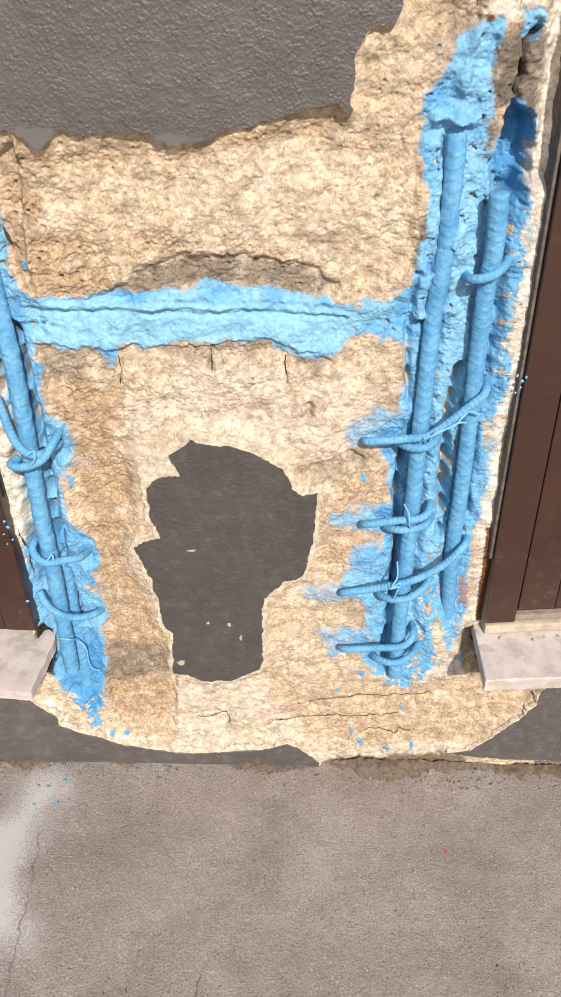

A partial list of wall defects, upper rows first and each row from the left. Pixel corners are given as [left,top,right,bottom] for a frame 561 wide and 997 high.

crack [514,23,543,100]
spalling [0,0,554,772]
crack [4,829,44,997]